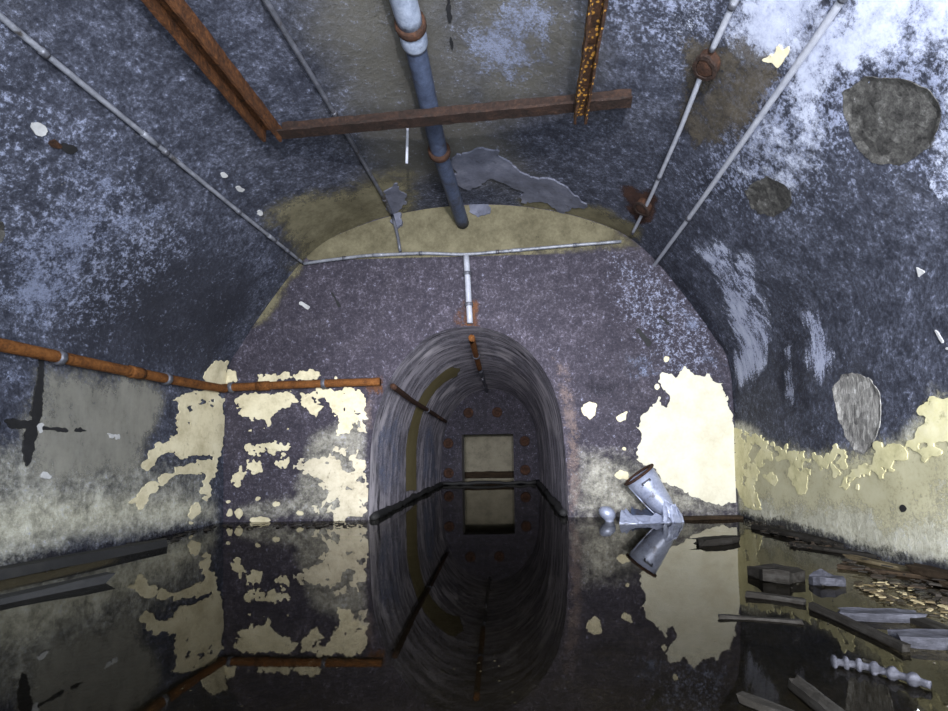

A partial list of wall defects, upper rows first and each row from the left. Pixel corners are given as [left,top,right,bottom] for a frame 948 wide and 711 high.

damp [666,0,948,188]
spalling [842,76,942,166]
damp [930,125,948,204]
peeling [129,360,369,524]
peeling [581,402,597,420]
peeling [614,470,629,480]
damp [695,239,772,387]
peeling [622,356,948,510]
damp [785,345,794,404]
damp [802,307,834,384]